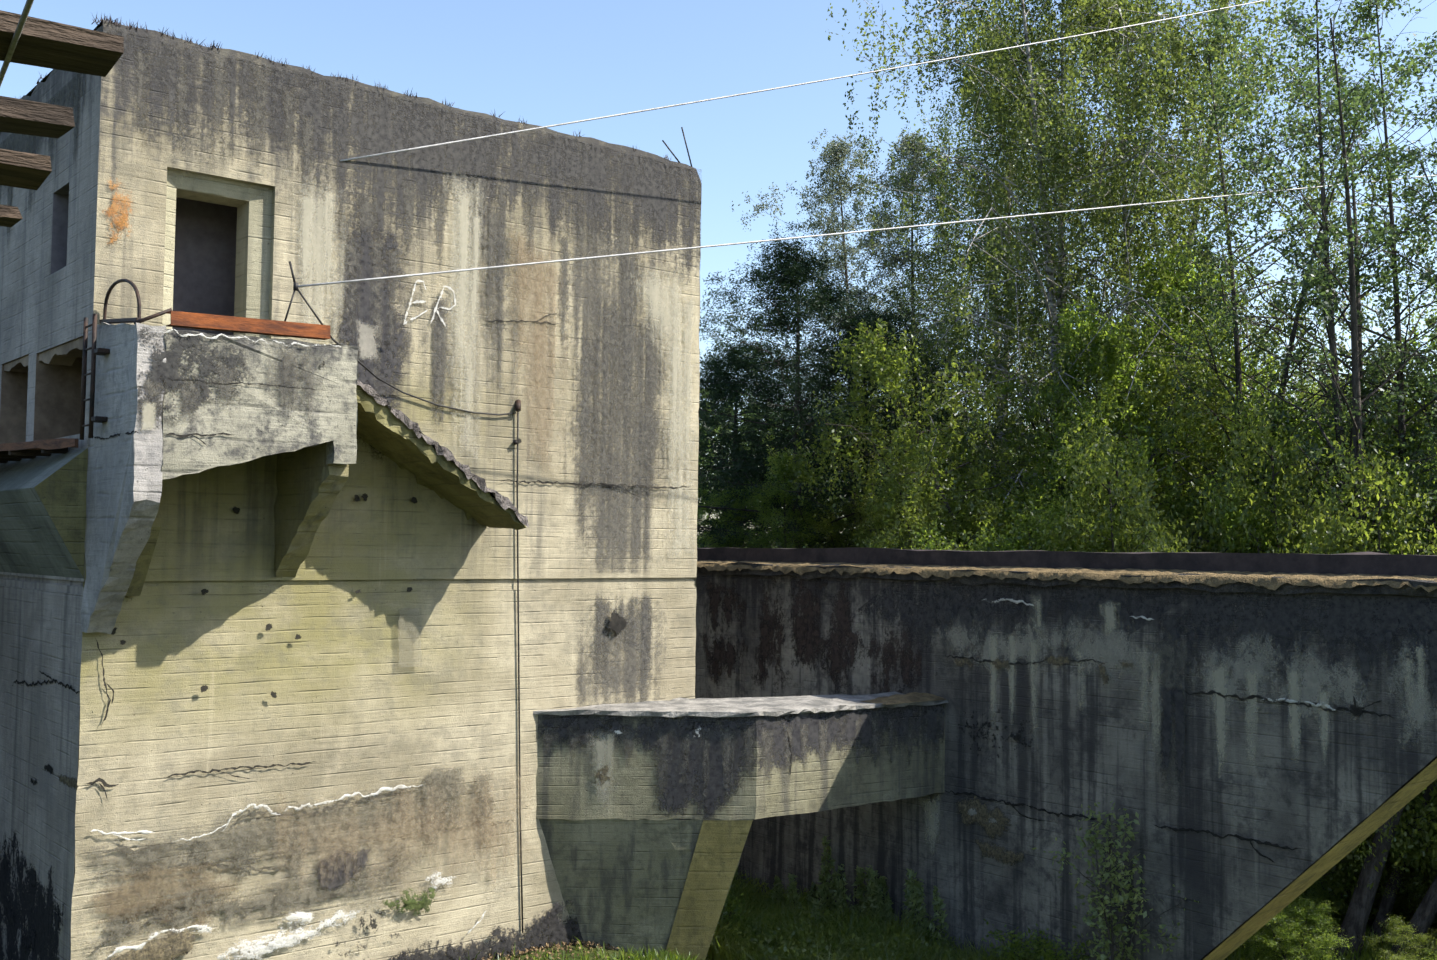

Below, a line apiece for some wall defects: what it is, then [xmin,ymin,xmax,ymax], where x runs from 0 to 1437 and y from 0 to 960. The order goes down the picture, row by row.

corrosion [102,180,132,243]
water stain [103,26,702,573]
crack [12,640,114,727]
water stain [538,576,1437,816]
crack [1184,690,1393,718]
crack [86,778,118,798]
crack [168,761,316,779]
water stain [80,768,515,960]
spalling [110,929,195,960]